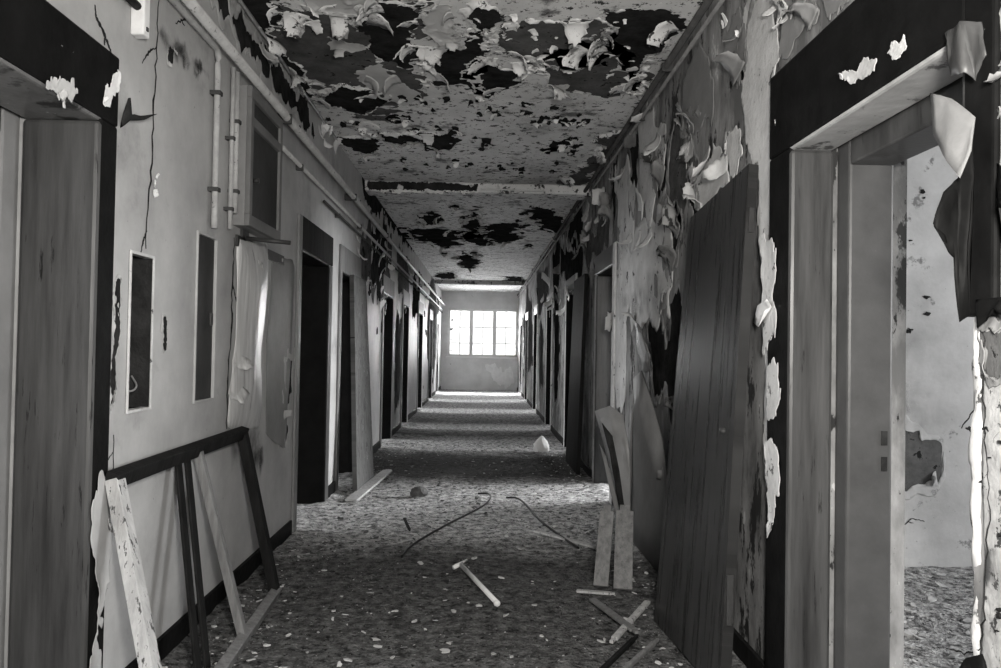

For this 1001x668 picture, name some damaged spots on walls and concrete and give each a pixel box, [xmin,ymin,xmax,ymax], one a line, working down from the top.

peeling [838,34,907,84]
peeling [945,21,1001,84]
peeling [46,76,78,109]
peeling [103,70,156,128]
peeling [210,0,850,538]
peeling [930,93,1001,668]
flaking render [905,414,946,500]